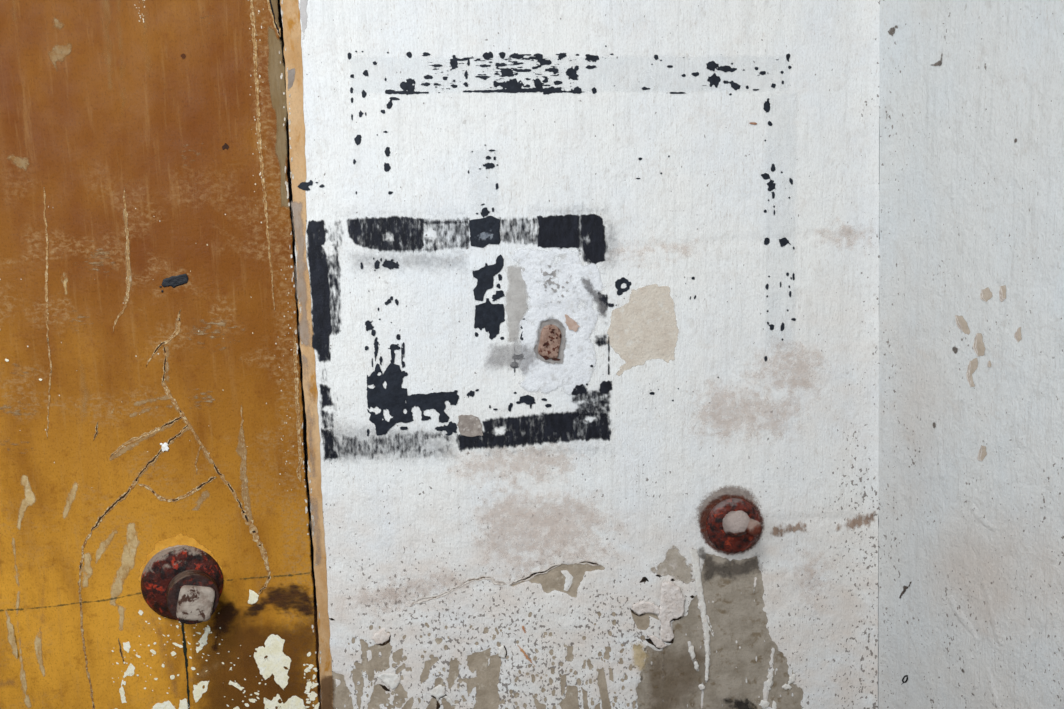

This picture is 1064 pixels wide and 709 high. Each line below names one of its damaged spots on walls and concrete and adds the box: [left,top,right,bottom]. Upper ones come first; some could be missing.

peeling [606,284,679,376]
crack [78,310,271,709]
corrosion [700,495,806,555]
peeling [115,641,183,709]
peeling [153,681,209,709]
peeling [196,627,210,653]
peeling [248,589,259,604]
peeling [229,634,319,709]
crack [410,576,507,607]
spalling [332,545,803,709]